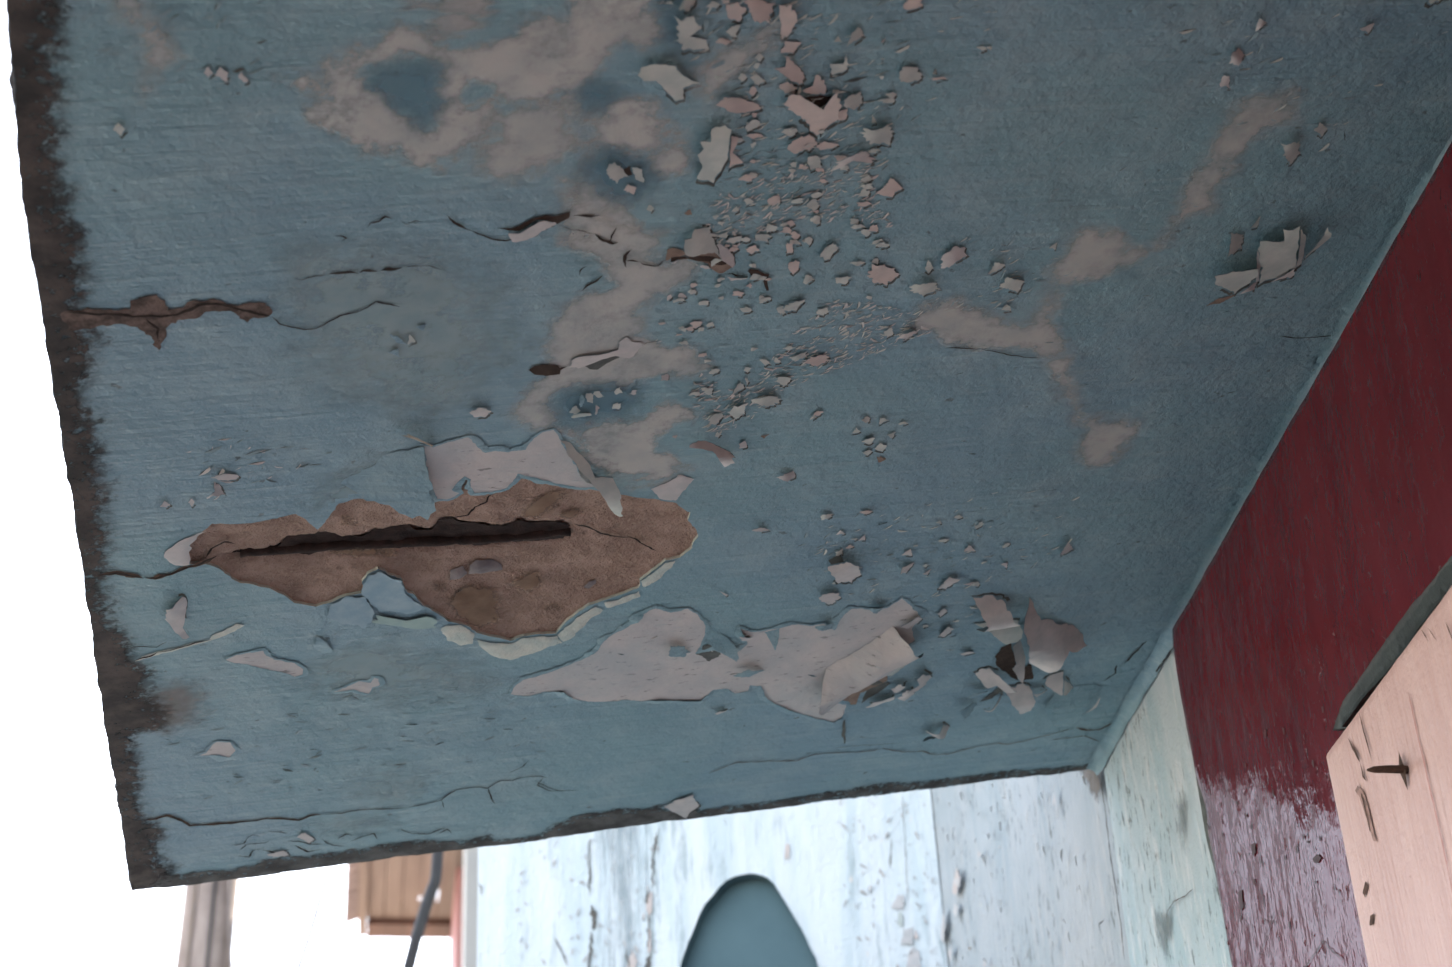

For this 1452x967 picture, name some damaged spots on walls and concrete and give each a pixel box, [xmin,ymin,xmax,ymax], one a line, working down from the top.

peeling [1205,12,1284,91]
peeling [606,162,645,195]
crack [60,212,769,350]
peeling [638,0,1058,467]
peeling [1207,216,1332,306]
crack [529,337,660,376]
peeling [569,387,637,418]
spalling [160,407,1102,744]